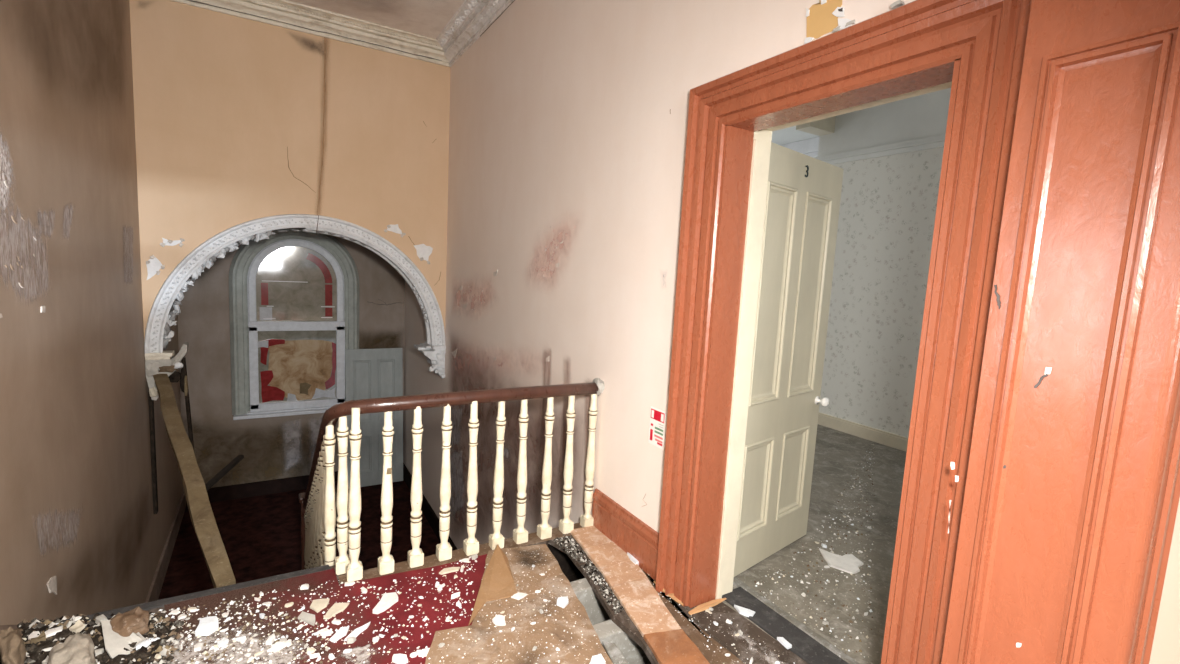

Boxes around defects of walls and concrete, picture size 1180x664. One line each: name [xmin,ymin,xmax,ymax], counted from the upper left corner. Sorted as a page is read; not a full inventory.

crack [188,0,441,233]
peeling [0,135,48,313]
peeling [384,224,433,264]